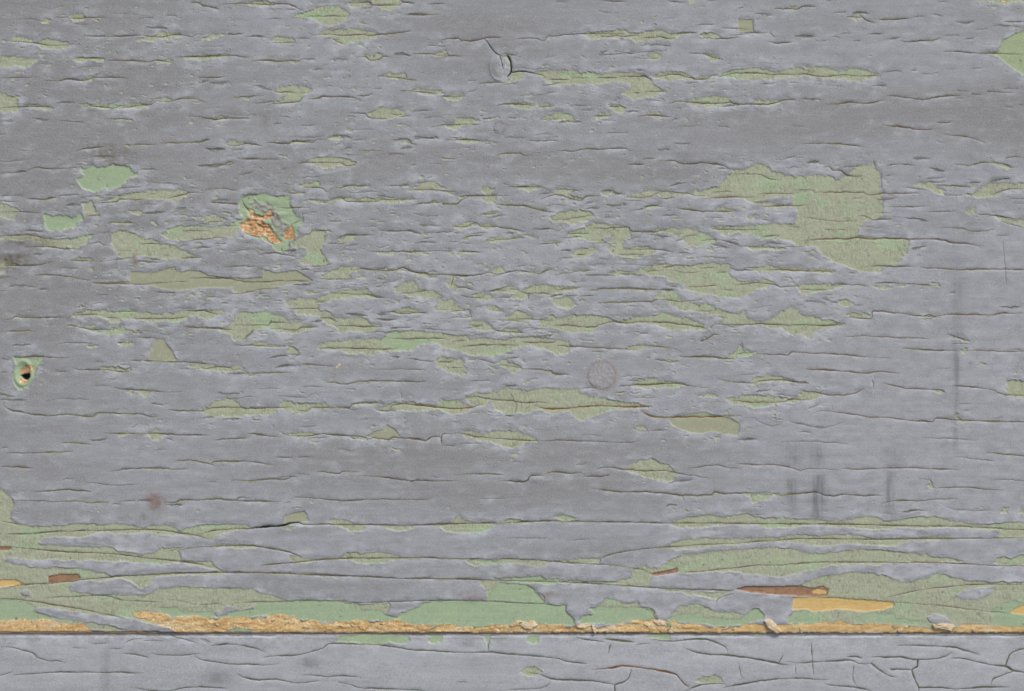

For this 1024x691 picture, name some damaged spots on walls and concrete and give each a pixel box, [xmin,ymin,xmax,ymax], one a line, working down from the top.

peeling [0,129,921,483]
crack [0,0,1024,444]
crack [0,316,1024,691]
peeling [0,489,1024,645]